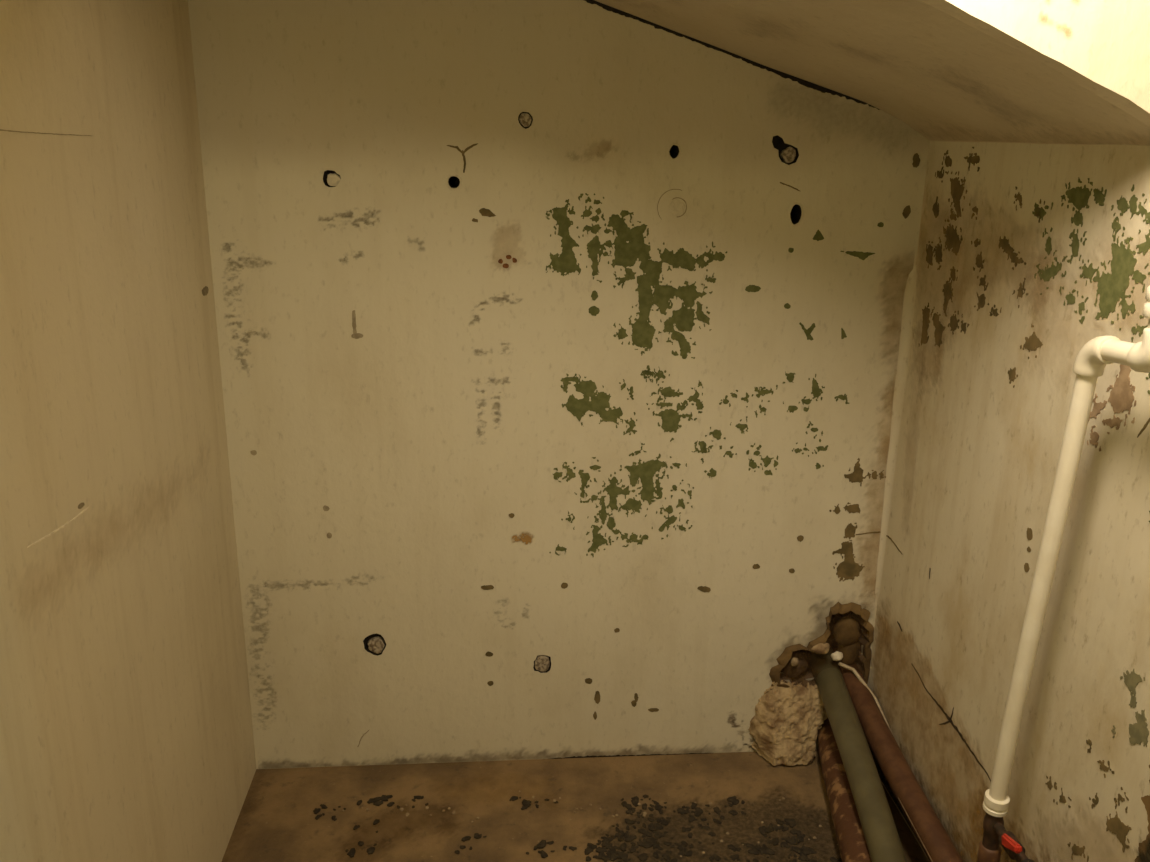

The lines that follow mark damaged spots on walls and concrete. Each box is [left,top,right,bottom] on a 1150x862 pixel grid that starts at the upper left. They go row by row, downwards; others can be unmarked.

peeling [919,147,1002,348]
peeling [998,177,1150,342]
peeling [546,193,849,557]
peeling [1020,324,1043,359]
peeling [1087,364,1150,451]
peeling [844,458,886,486]
peeling [829,502,865,581]
spalling [769,602,874,690]
peeling [585,678,600,720]
peeling [1111,669,1149,747]
peeling [1086,739,1114,778]
peeling [1106,765,1150,862]